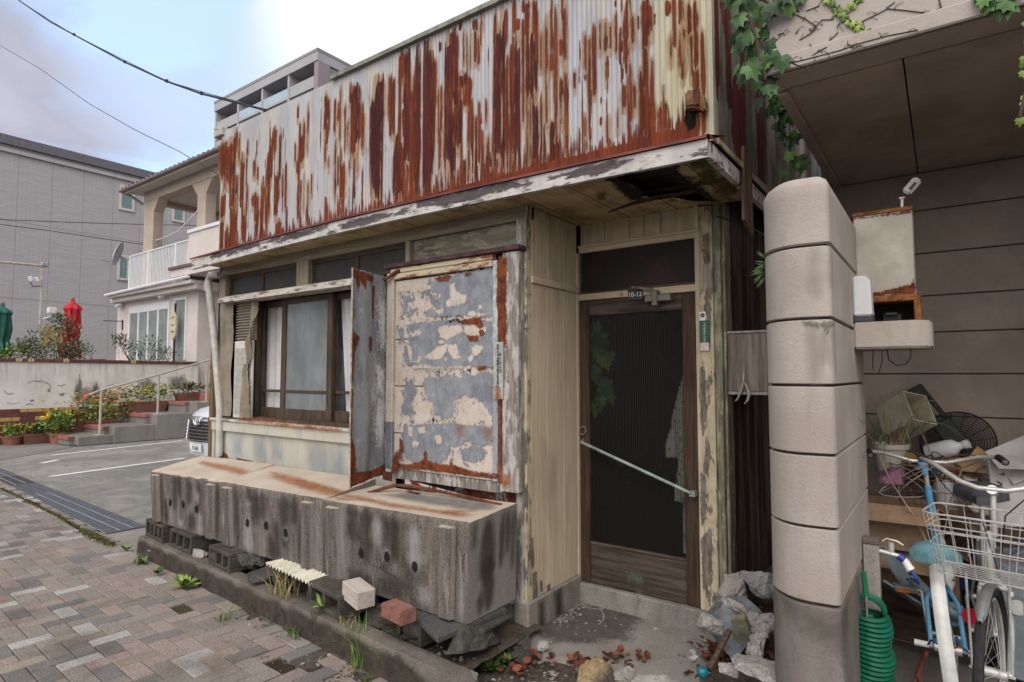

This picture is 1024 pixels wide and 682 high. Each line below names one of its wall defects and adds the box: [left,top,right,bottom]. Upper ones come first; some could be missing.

corrosion [219,0,763,250]
peeling [370,267,493,468]
corrosion [458,318,484,342]
corrosion [873,279,917,296]
corrosion [202,452,253,474]
corrosion [275,332,510,516]
peeling [699,366,713,593]
water stain [349,508,422,595]
water stain [479,519,515,608]